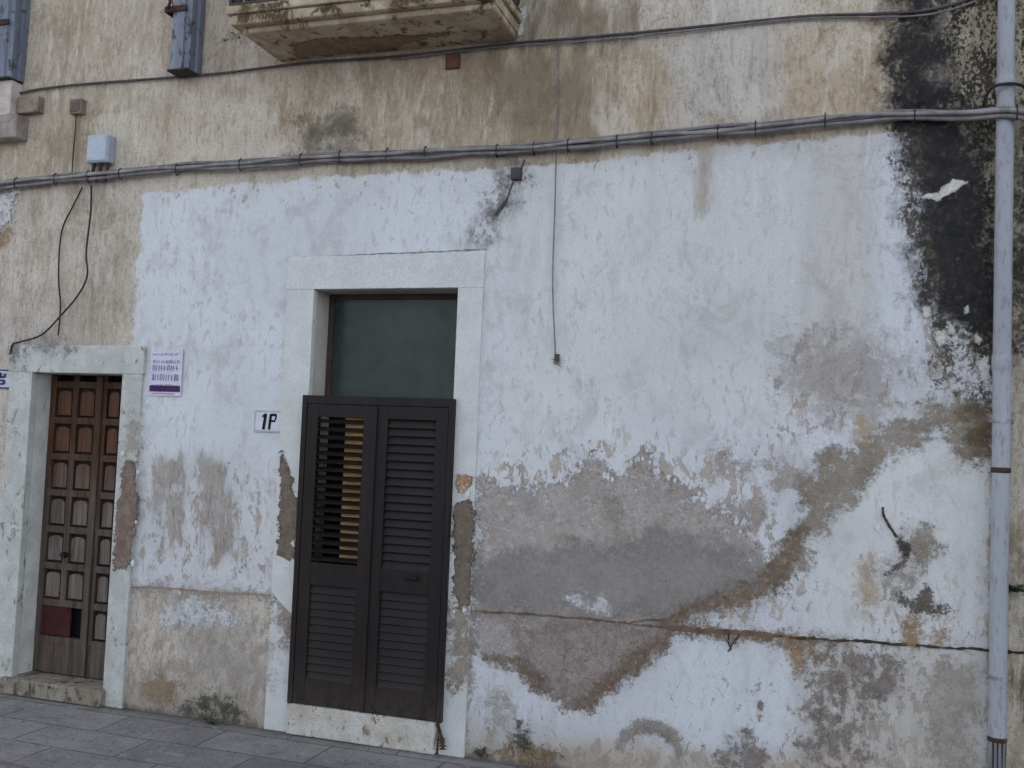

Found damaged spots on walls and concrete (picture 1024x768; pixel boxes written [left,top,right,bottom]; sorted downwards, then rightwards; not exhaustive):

leakage [288,107,365,156]
leakage [668,0,998,626]
leakage [1012,127,1024,353]
spalling [110,409,142,571]
spalling [275,450,298,570]
peeling [444,440,803,719]
crack [472,602,1024,654]